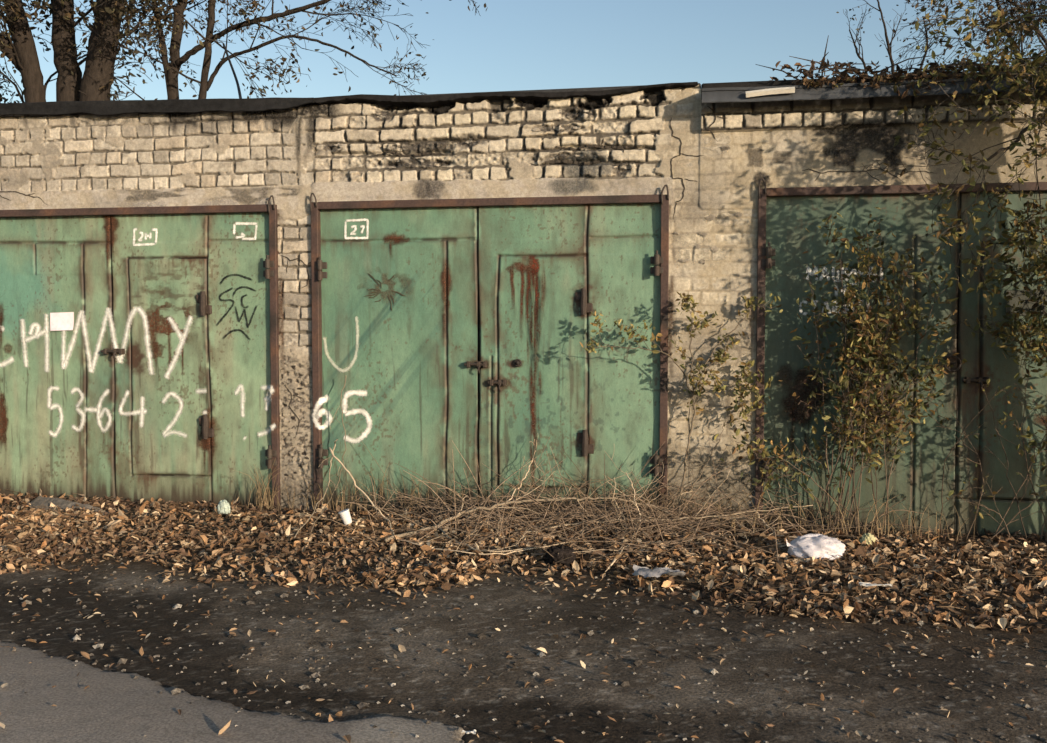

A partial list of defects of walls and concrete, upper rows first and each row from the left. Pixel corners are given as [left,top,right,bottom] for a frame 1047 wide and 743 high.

damp [297,114,316,153]
damp [553,152,609,193]
crack [670,106,725,223]
damp [817,120,909,173]
rust [441,264,451,326]
rust [508,256,545,482]
rust [0,379,8,443]
rust [779,366,829,455]